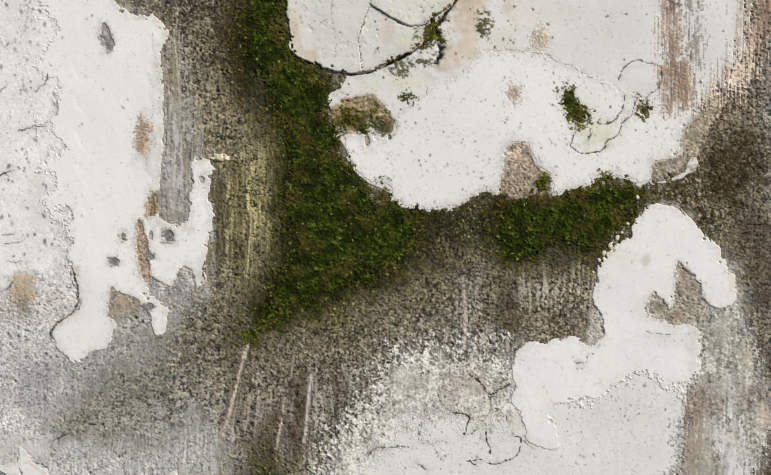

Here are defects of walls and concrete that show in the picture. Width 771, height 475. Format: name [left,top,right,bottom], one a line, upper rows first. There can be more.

peeling [0,0,230,364]
damp [33,0,611,475]
crack [341,0,457,76]
crack [435,374,528,465]
peeling [303,195,771,475]
peeling [327,0,754,213]
damp [613,1,771,398]
damp [752,428,771,475]